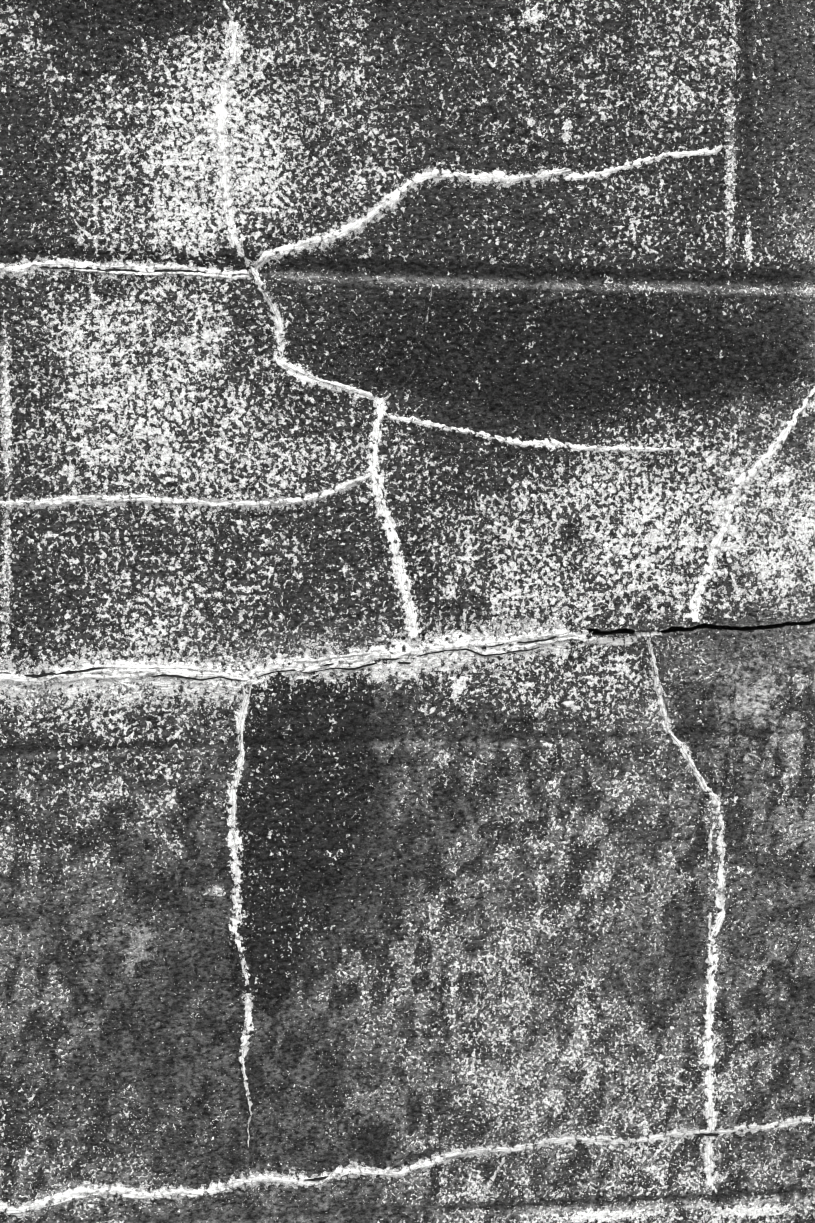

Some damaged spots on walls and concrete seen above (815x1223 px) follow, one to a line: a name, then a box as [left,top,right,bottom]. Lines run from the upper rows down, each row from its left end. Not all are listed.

crack [0,0,724,642]
crack [0,386,815,1220]